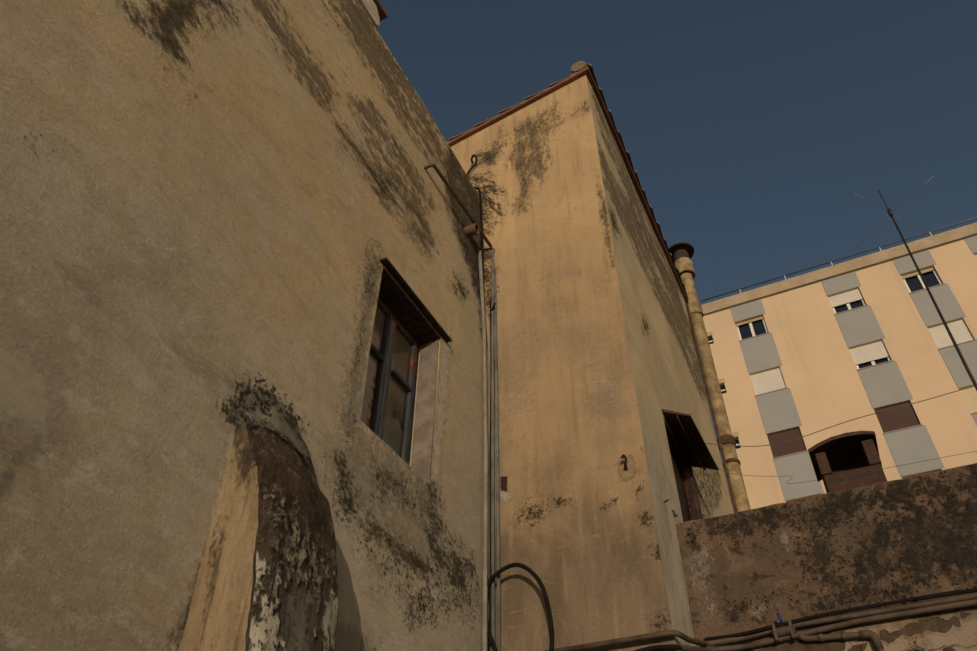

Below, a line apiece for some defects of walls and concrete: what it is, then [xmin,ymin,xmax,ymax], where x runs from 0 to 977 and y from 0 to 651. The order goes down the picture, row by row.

leakage [121,0,558,351]
peeling [249,488,339,651]
leakage [347,512,483,638]
leakage [675,464,977,626]
flaking render [737,609,975,651]